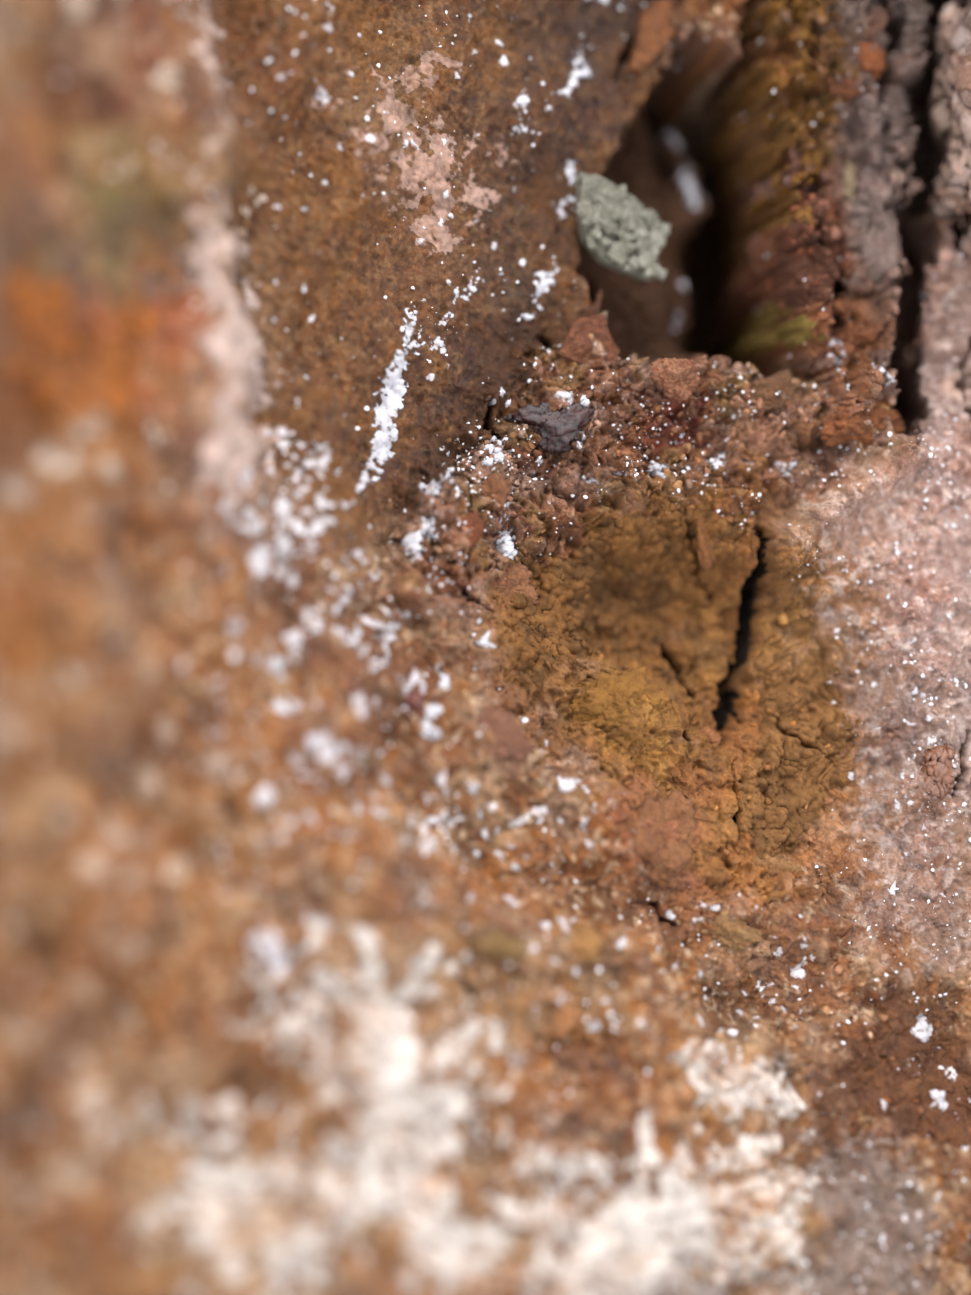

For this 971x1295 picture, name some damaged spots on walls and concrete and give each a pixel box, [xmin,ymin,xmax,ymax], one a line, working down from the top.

efflorescence [494,39,509,67]
crack [613,39,632,81]
efflorescence [239,185,267,220]
efflorescence [438,190,454,227]
leakage [190,268,596,871]
crack [660,529,771,737]
efflorescence [155,712,175,747]
efflorescence [131,765,159,804]
efflorescence [76,814,192,888]
efflorescence [492,895,519,911]
efflorescence [0,901,856,1295]
efflorescence [835,1184,924,1293]